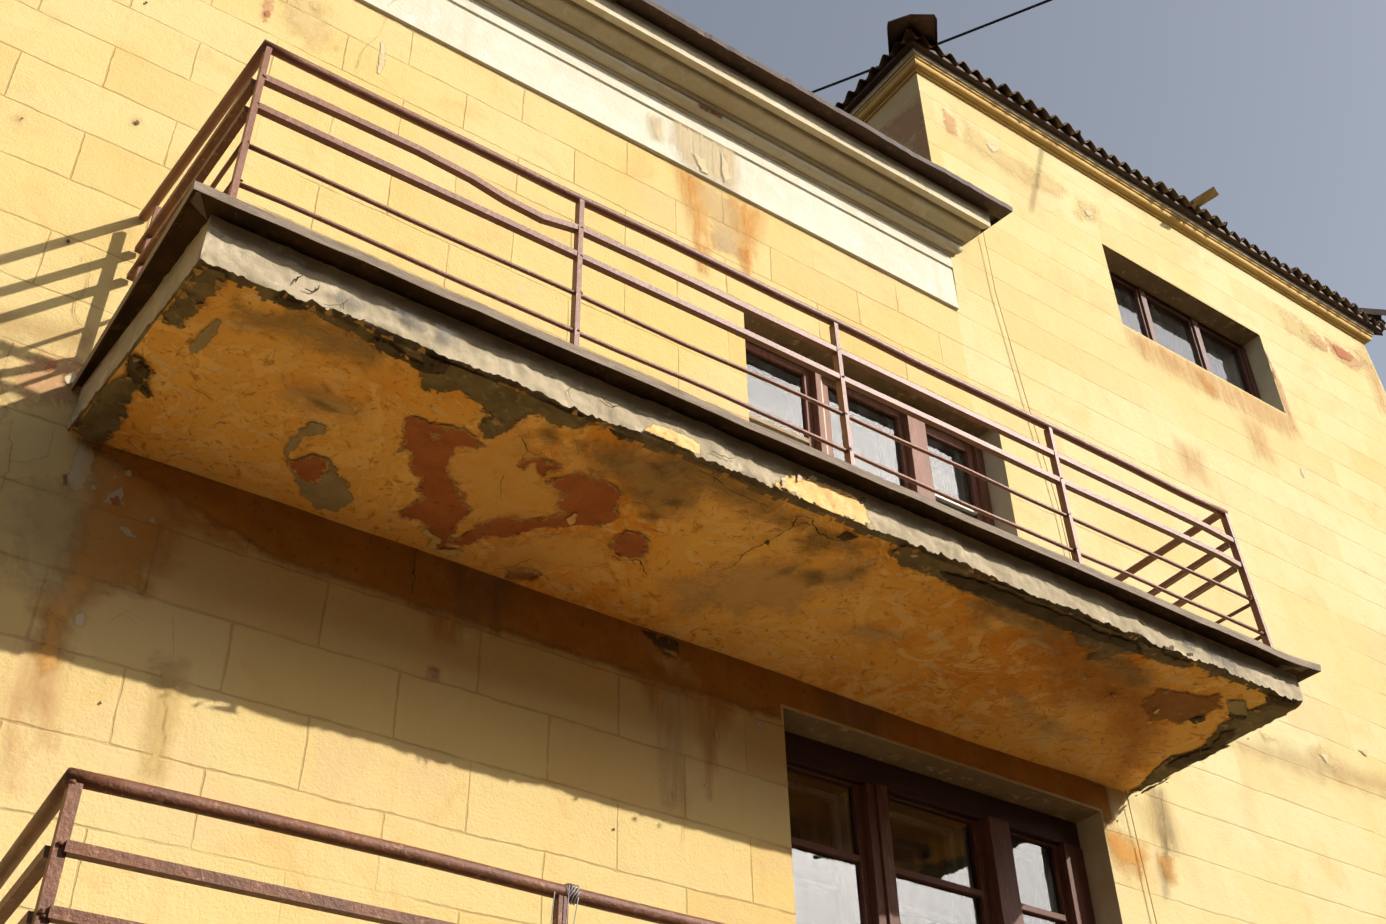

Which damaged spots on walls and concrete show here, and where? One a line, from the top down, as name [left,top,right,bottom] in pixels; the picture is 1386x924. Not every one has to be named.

crack [74,255,94,345]
damp [188,319,221,355]
spalling [63,354,156,505]
damp [283,390,356,458]
peeling [273,293,701,559]
peeling [775,474,875,541]
damp [23,424,1175,879]
spalling [1130,689,1298,796]